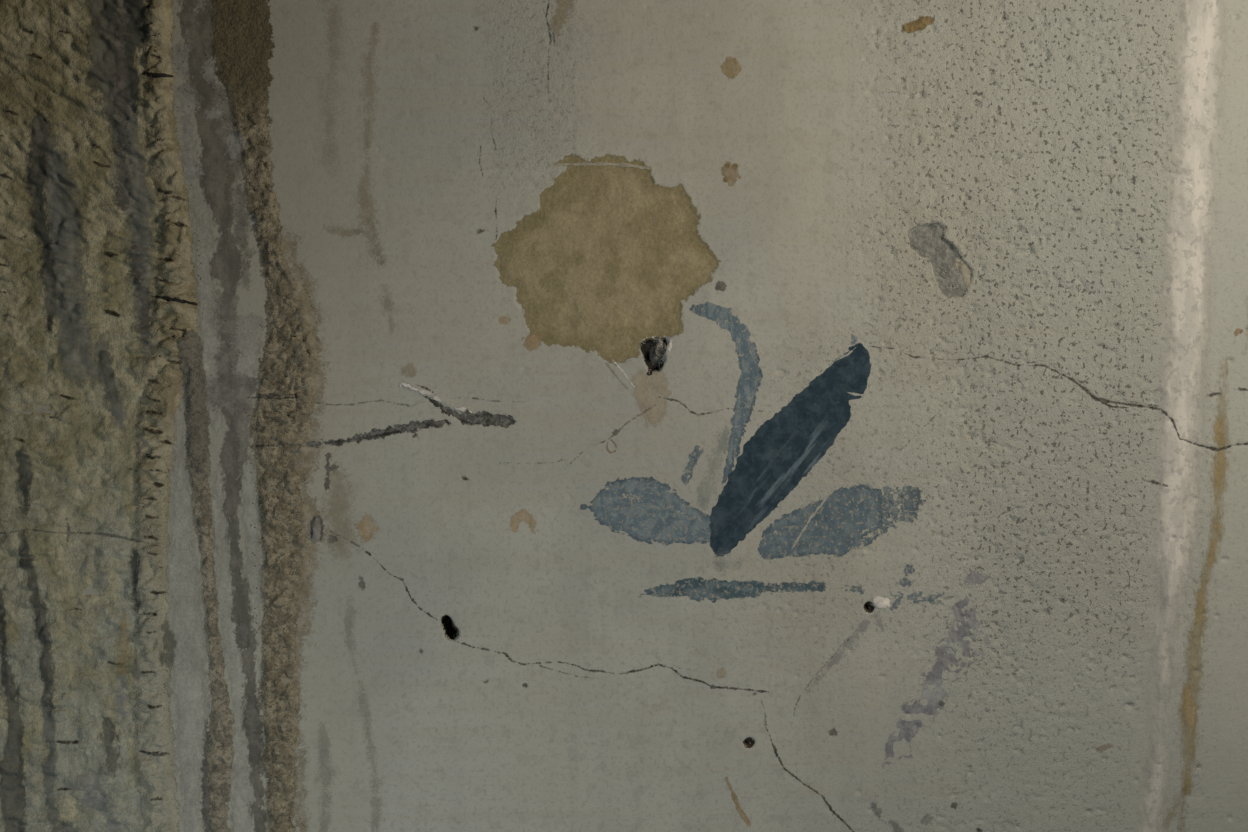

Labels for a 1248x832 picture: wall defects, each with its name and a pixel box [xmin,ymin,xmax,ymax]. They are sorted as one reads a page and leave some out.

rust [901,16,935,33]
damp [27,111,127,429]
damp [86,0,158,360]
spalling [492,154,727,366]
damp [160,0,266,832]
crack [252,382,516,448]
crack [958,355,1248,451]
damp [0,589,26,832]
damp [18,531,76,832]
crack [330,531,437,620]
crack [462,642,854,832]
rust [1182,393,1228,793]